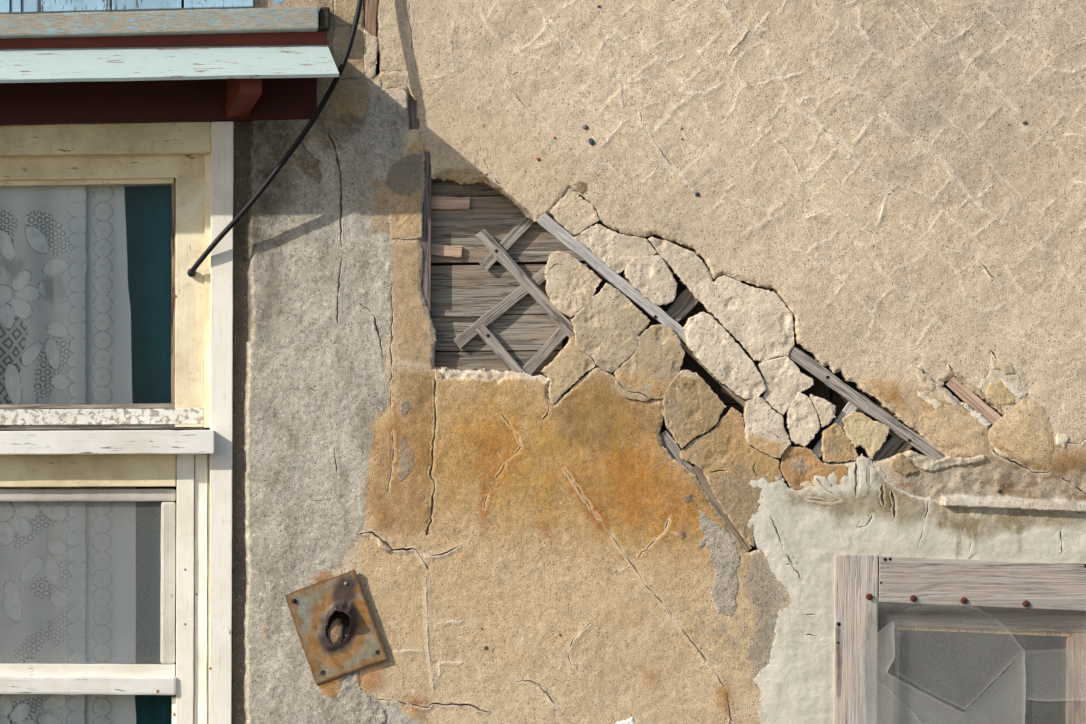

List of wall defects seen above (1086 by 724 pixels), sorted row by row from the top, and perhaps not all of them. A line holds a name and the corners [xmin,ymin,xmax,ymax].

crack [678,0,769,98]
crack [819,0,1024,115]
crack [480,156,503,188]
crack [756,68,1009,247]
crack [324,132,399,497]
crack [944,243,1005,290]
water stain [442,384,718,536]
spalling [890,357,1028,477]
peeling [1055,434,1070,449]
crack [358,369,562,717]
crack [561,466,736,724]
rust [319,679,339,697]